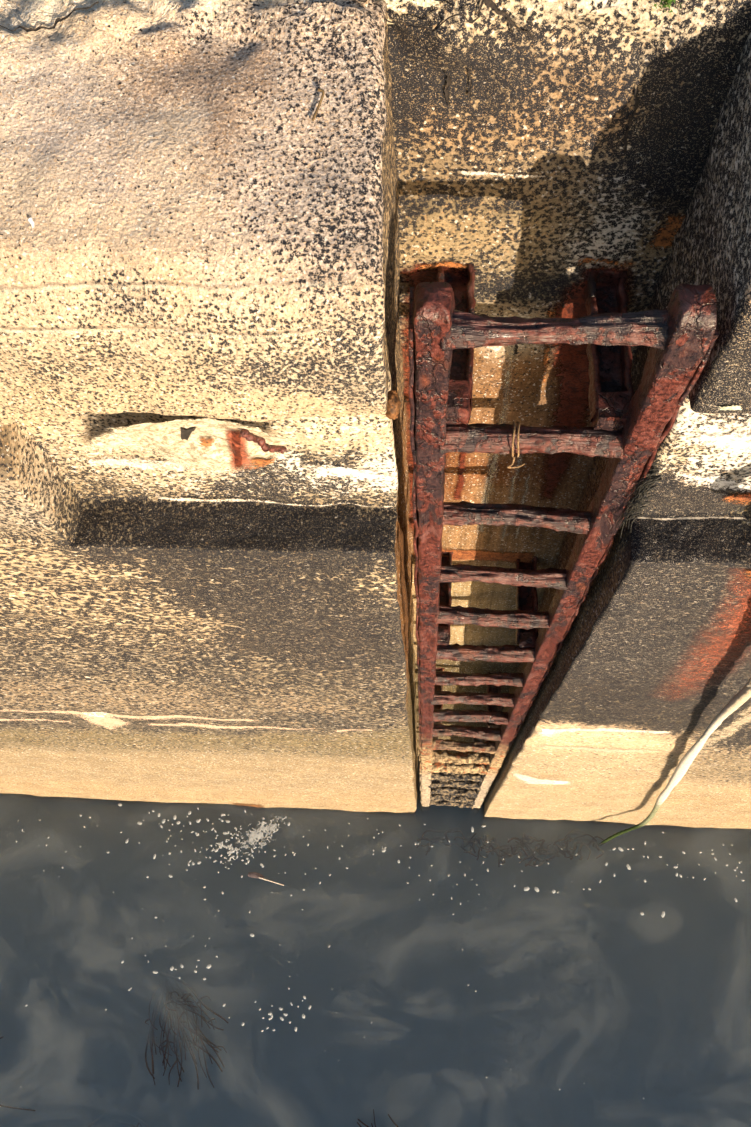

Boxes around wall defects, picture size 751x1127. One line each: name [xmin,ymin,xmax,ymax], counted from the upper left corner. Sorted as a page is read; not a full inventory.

crack [0,1,99,32]
damp [692,432,751,454]
damp [88,457,217,472]
damp [309,465,398,481]
damp [674,472,751,492]
rust [724,493,751,505]
rust [687,571,751,680]
damp [538,728,670,753]